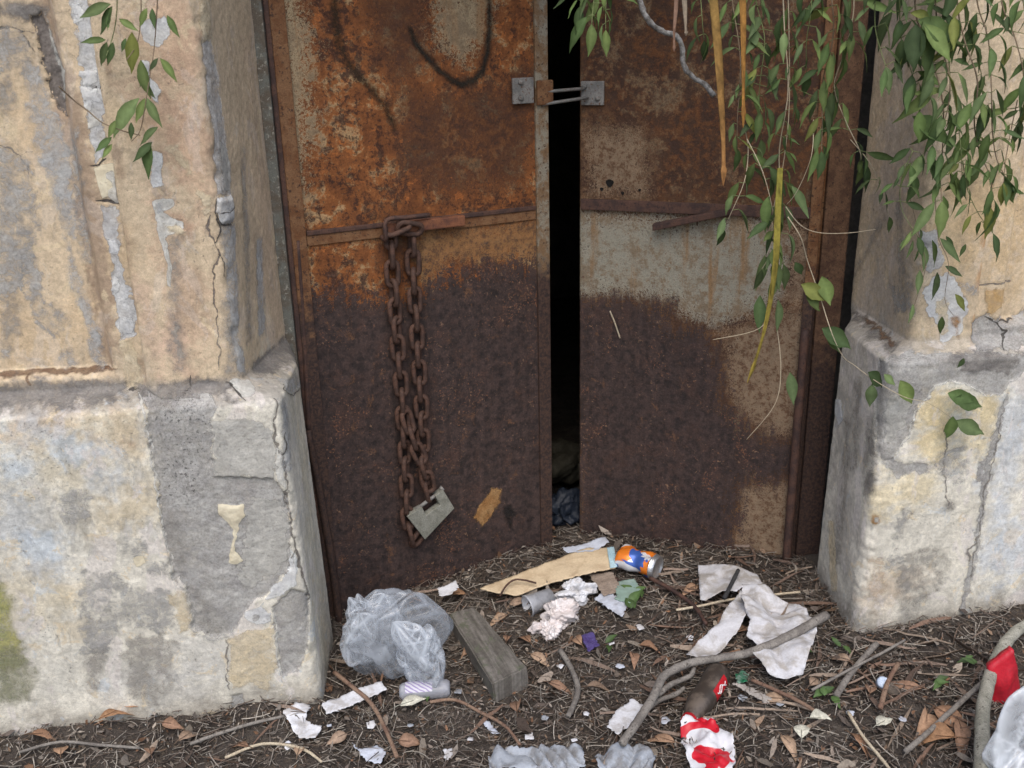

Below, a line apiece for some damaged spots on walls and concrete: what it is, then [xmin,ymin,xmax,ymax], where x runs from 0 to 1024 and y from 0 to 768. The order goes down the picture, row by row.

spalling [69,0,310,708]
crack [206,214,225,366]
spalling [863,230,1024,494]
rust [474,488,515,526]
crack [960,393,1008,612]